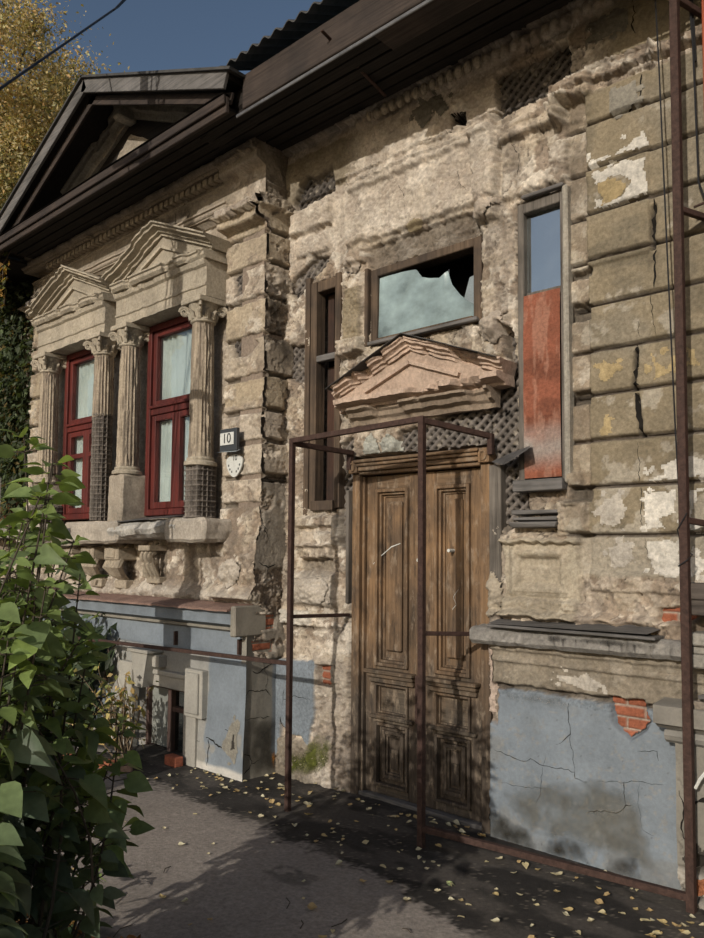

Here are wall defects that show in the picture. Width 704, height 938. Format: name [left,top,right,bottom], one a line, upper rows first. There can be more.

peeling [586,130,649,210]
crack [633,199,657,553]
peeling [591,489,636,568]
peeling [640,459,679,578]
peeling [688,456,704,534]
peeling [690,546,704,583]
flaking render [222,715,240,766]
crack [247,664,310,727]
crack [495,703,704,839]
flaking render [551,666,652,737]
water stain [492,817,528,844]